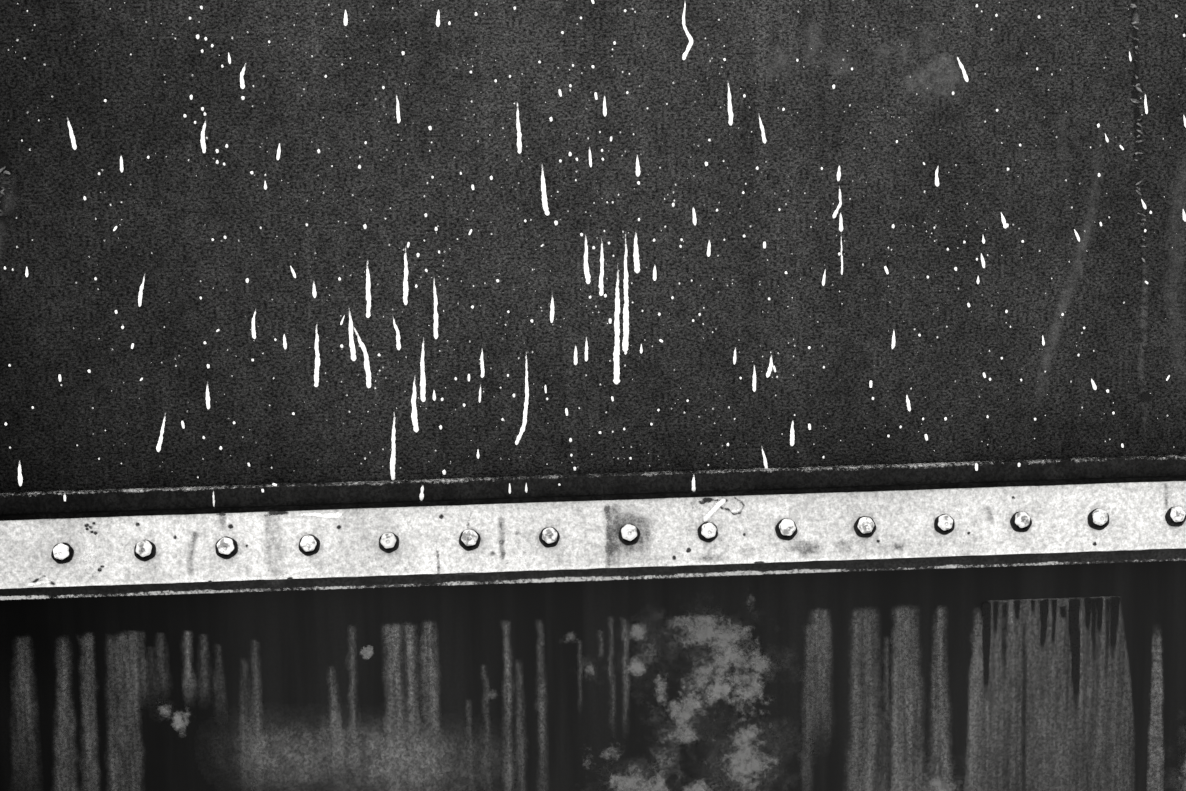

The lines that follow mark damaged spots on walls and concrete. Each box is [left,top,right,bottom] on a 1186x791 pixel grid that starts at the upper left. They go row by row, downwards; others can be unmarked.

leakage [386,625,436,749]
leakage [893,609,919,791]
leakage [934,610,949,784]
leakage [969,596,1120,788]
leakage [1148,638,1162,791]